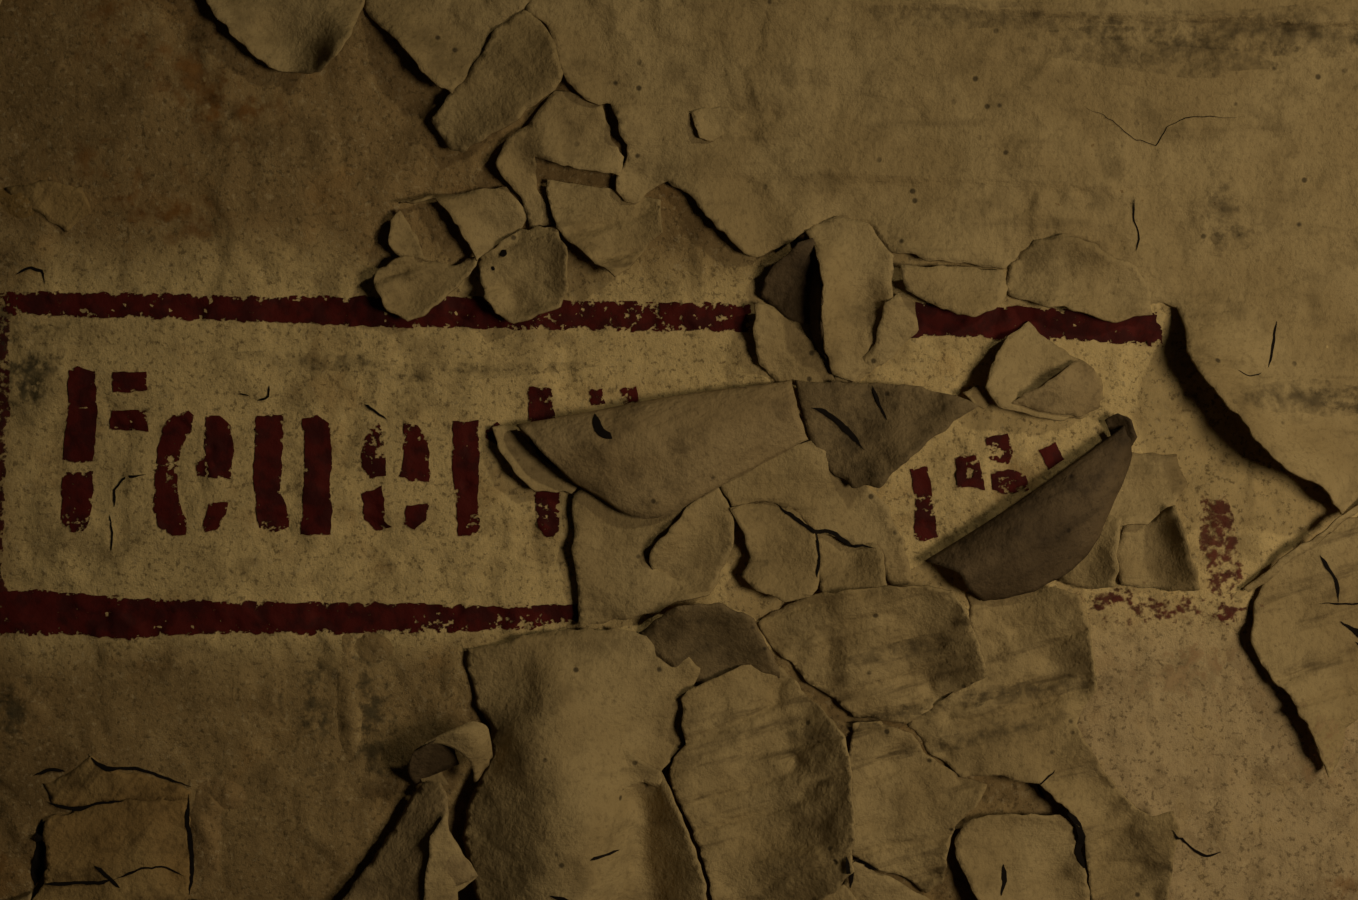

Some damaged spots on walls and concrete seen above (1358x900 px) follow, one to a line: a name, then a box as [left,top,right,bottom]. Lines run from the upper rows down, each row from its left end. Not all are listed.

peeling [13,756,197,900]
peeling [342,216,1200,900]
peeling [206,0,1358,778]